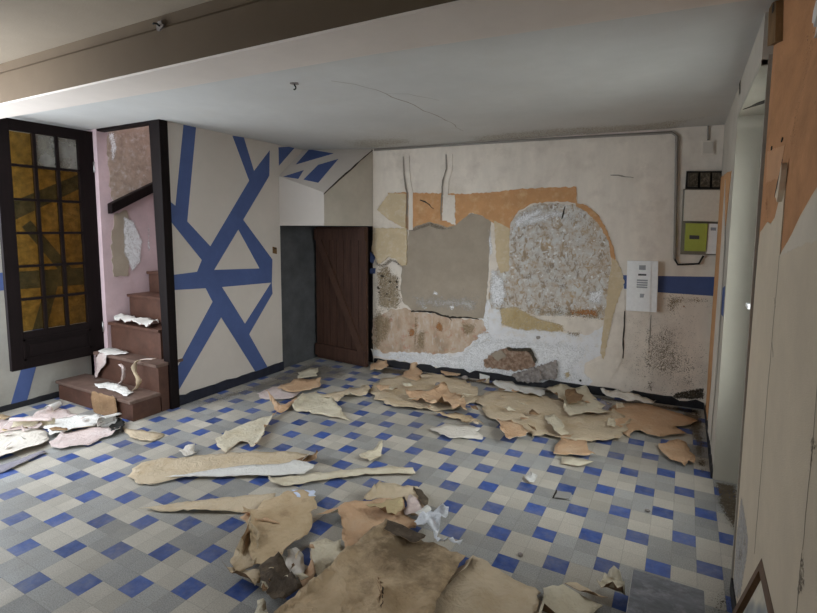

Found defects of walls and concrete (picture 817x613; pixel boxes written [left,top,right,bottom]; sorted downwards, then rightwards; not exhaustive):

flaking render [371,203,611,355]
spalling [483,347,558,383]
damp [621,291,708,400]
damp [796,392,817,613]